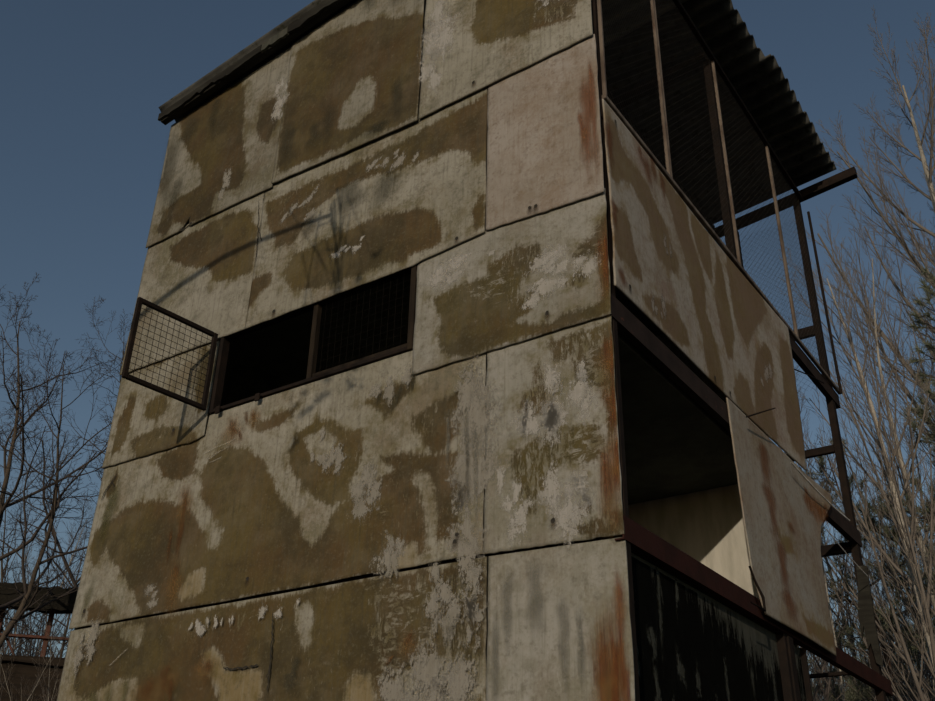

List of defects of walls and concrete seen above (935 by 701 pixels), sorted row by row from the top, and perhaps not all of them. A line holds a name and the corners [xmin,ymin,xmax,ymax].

corrosion [578,68,612,159]
peeling [368,364,412,407]
peeling [369,530,407,583]
peeling [377,351,601,701]
corrosion [760,445,777,531]
peeling [189,615,234,638]
corrosion [595,582,630,701]
peeling [646,569,674,701]